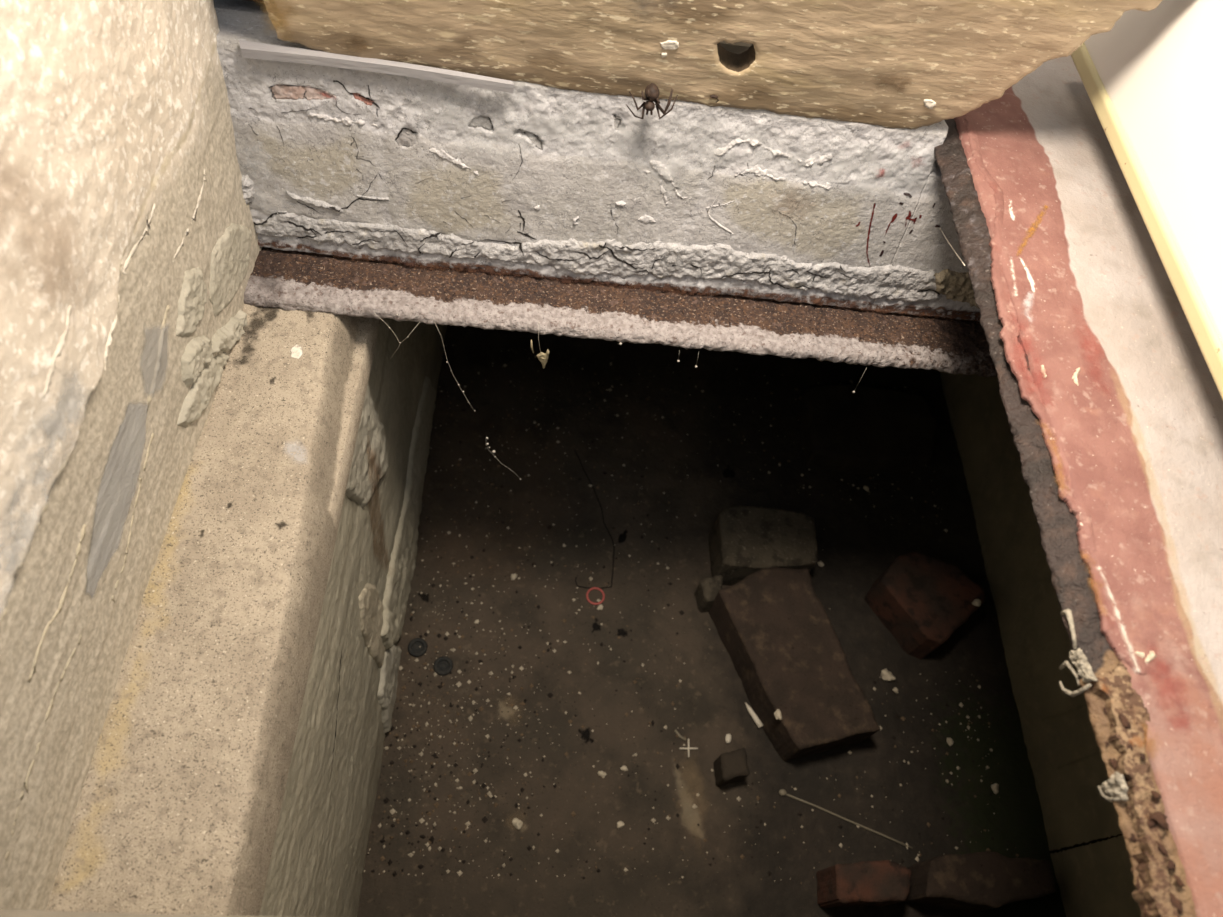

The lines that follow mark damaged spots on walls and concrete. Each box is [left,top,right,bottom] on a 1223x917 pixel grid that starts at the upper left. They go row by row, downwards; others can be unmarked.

peeling [270,84,337,100]
crack [250,80,382,212]
crack [443,143,537,240]
flaking render [176,223,252,428]